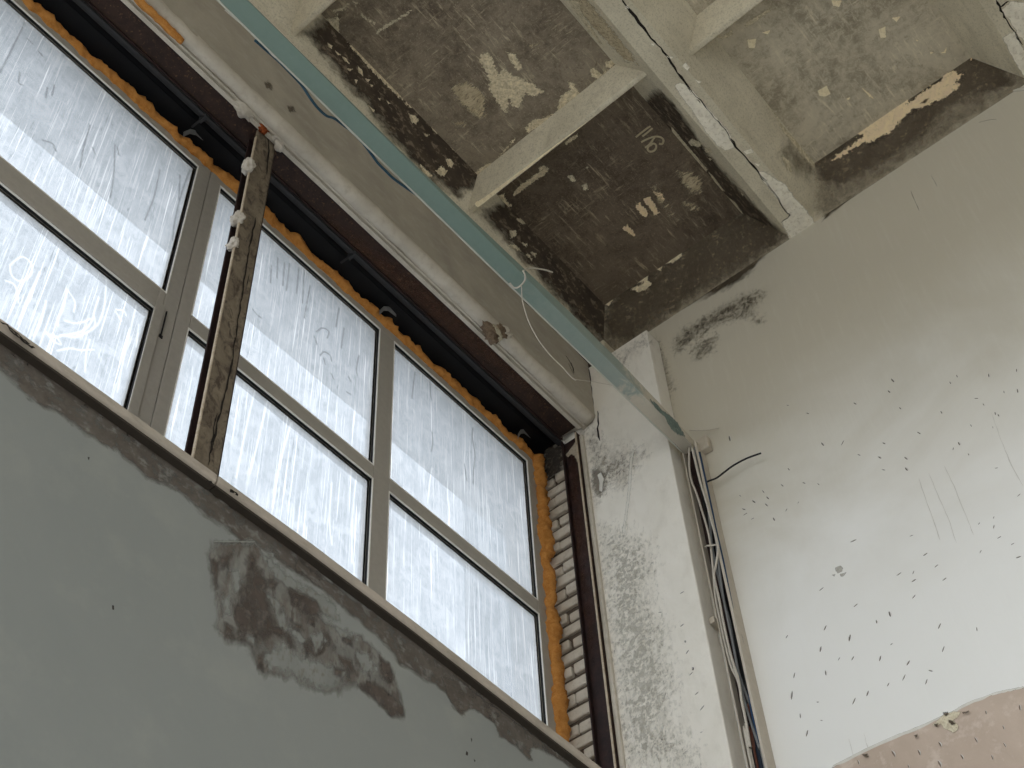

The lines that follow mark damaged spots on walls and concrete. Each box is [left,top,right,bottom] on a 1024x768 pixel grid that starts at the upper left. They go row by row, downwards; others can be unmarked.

peeling [326,1,437,136]
peeling [479,51,544,113]
peeling [525,60,614,133]
crack [622,0,790,223]
peeling [832,71,964,161]
peeling [420,149,454,177]
peeling [498,165,549,261]
peeling [636,191,665,217]
peeling [632,253,682,292]
peeling [209,541,404,717]
flaking render [833,688,1024,768]